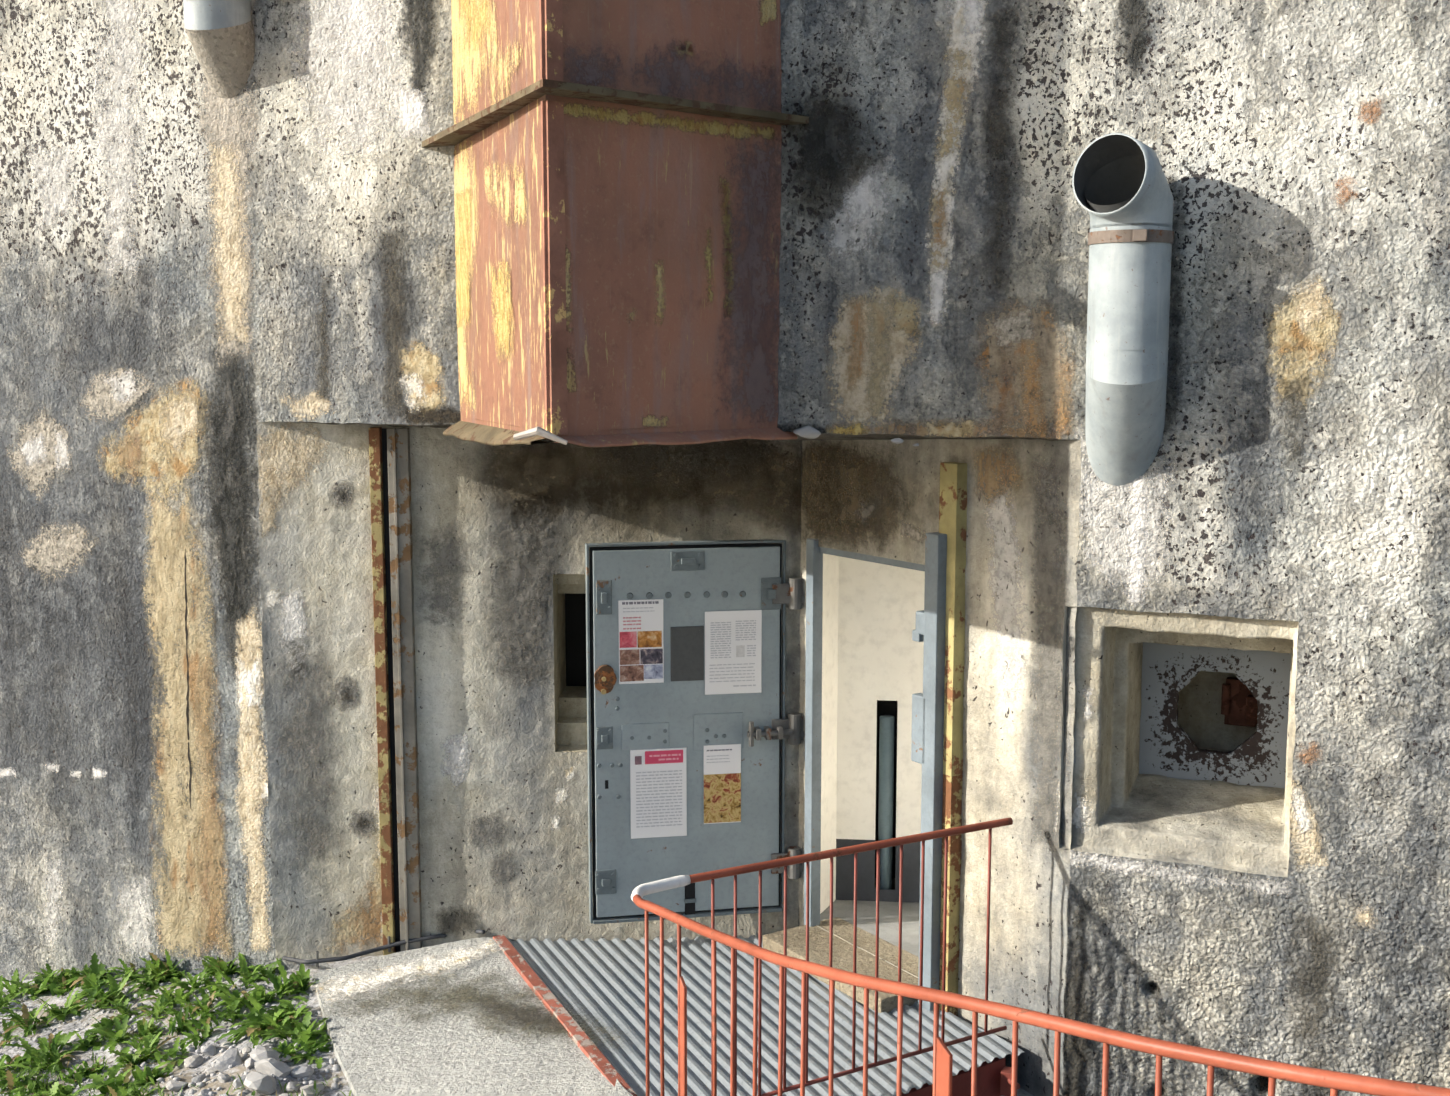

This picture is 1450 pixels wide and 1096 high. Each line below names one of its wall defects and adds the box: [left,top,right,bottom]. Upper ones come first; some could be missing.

water stain [422,532,465,624]
water stain [490,517,560,686]
crack [184,548,192,809]
water stain [45,862,63,941]
water stain [118,877,157,957]